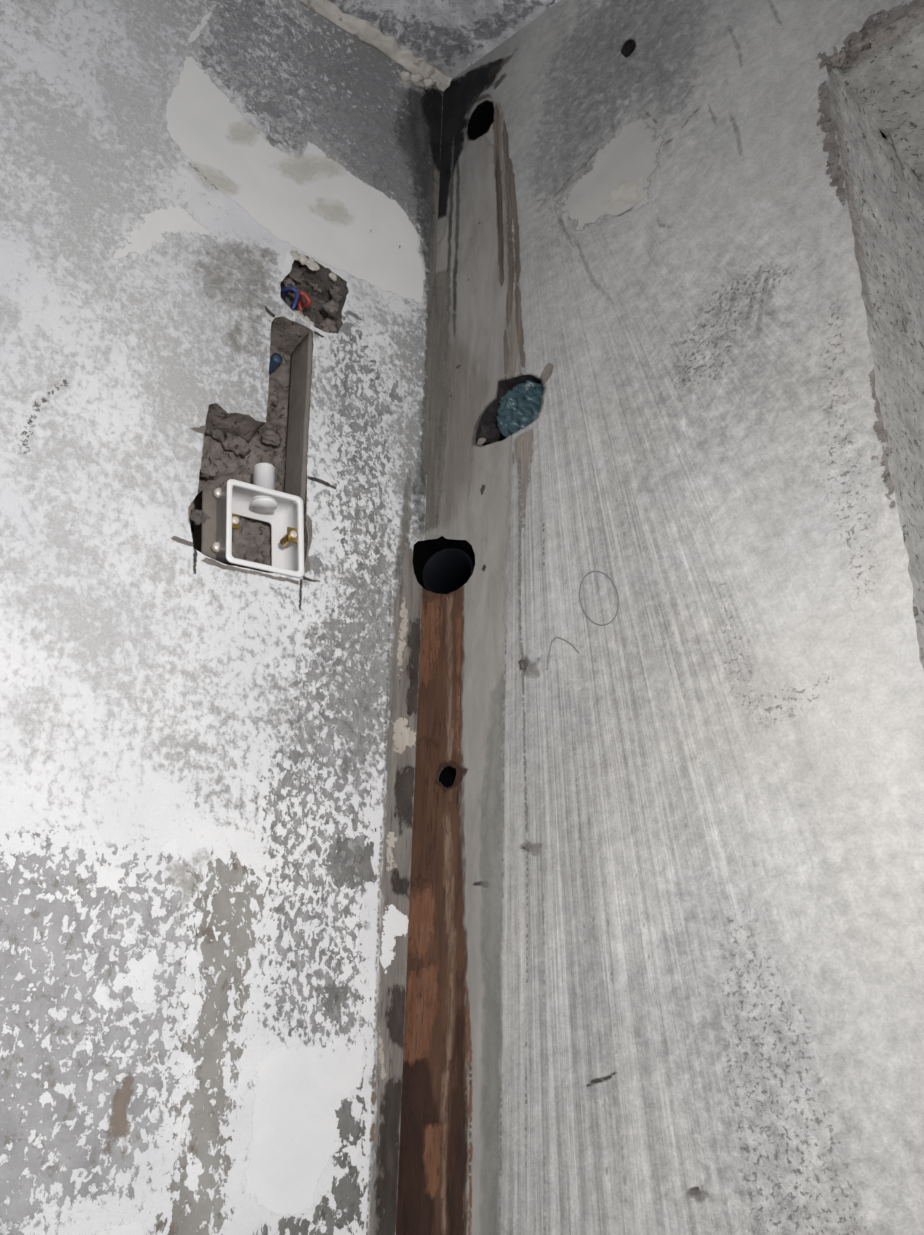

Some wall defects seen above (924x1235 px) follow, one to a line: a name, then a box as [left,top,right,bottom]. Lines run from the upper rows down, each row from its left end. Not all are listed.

peeling [201,0,430,232]
peeling [0,250,416,1235]
rust [396,586,473,1235]